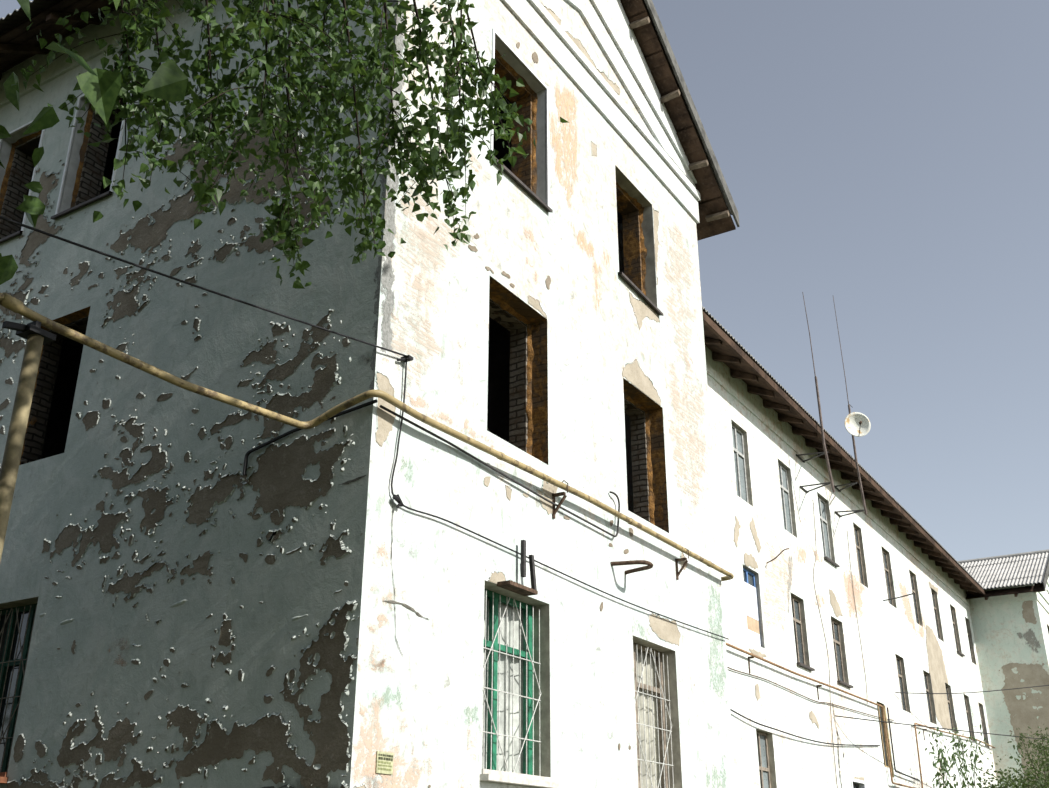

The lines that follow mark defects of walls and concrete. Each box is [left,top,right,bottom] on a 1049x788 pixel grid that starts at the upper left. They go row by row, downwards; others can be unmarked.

peeling [0,159,72,365]
peeling [63,108,343,354]
flaking render [353,0,480,446]
peeling [0,398,10,435]
peeling [42,306,355,625]
peeling [6,581,431,788]
flaking render [999,661,1049,788]